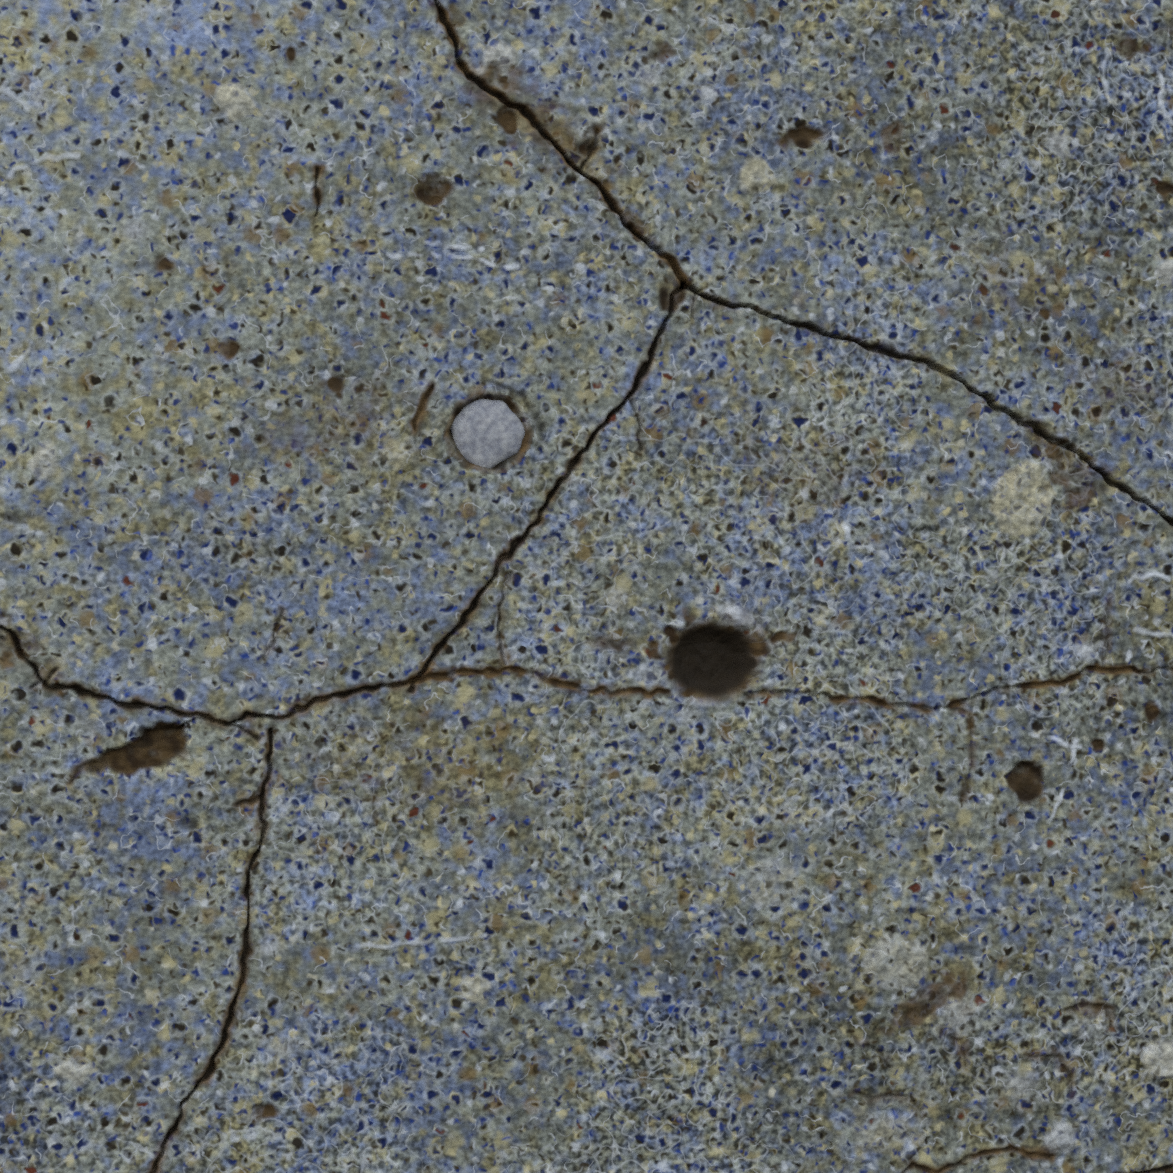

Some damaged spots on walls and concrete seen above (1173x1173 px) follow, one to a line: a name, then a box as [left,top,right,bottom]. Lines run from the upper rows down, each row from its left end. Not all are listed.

crack [427,0,484,82]
crack [587,121,608,153]
crack [1111,476,1173,532]
crack [25,153,1098,1173]
peeling [661,685,727,712]
crack [745,593,1173,773]
spalling [63,720,192,790]
spalling [1005,759,1046,809]
crack [1057,997,1118,1035]
crack [1099,1162,1173,1173]